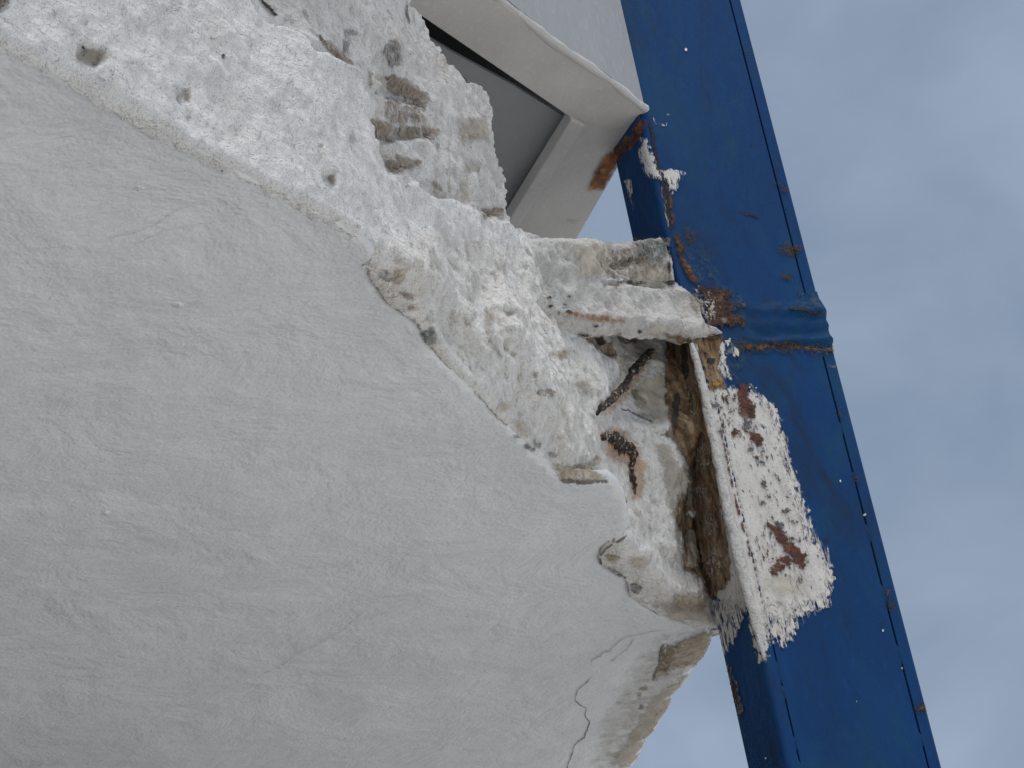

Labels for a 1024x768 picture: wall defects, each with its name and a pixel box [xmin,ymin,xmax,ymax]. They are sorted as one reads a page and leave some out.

flaking render [77,46,107,65]
flaking render [258,0,510,223]
corrosion [590,120,642,190]
peeling [638,138,686,226]
corrosion [736,340,834,353]
corrosion [596,231,745,600]
spalling [362,235,836,767]
crack [567,679,590,768]